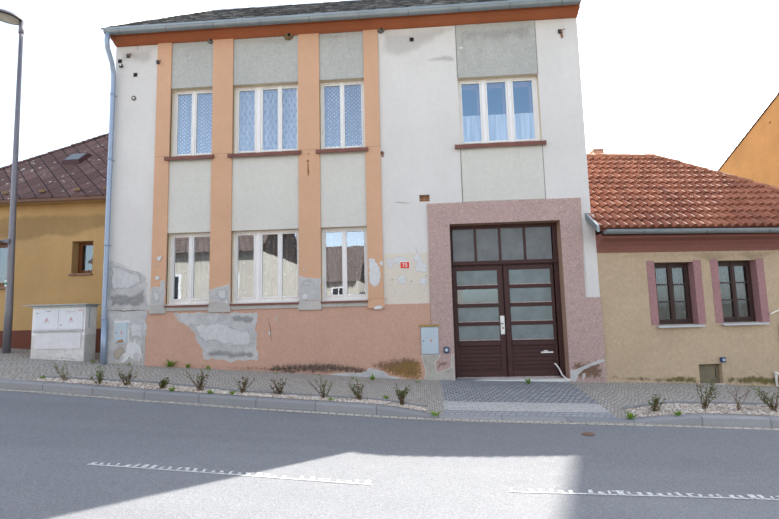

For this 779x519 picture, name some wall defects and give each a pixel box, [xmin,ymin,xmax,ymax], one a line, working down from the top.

flaking render [106,256,166,364]
flaking render [174,284,258,363]
peeling [369,254,428,309]